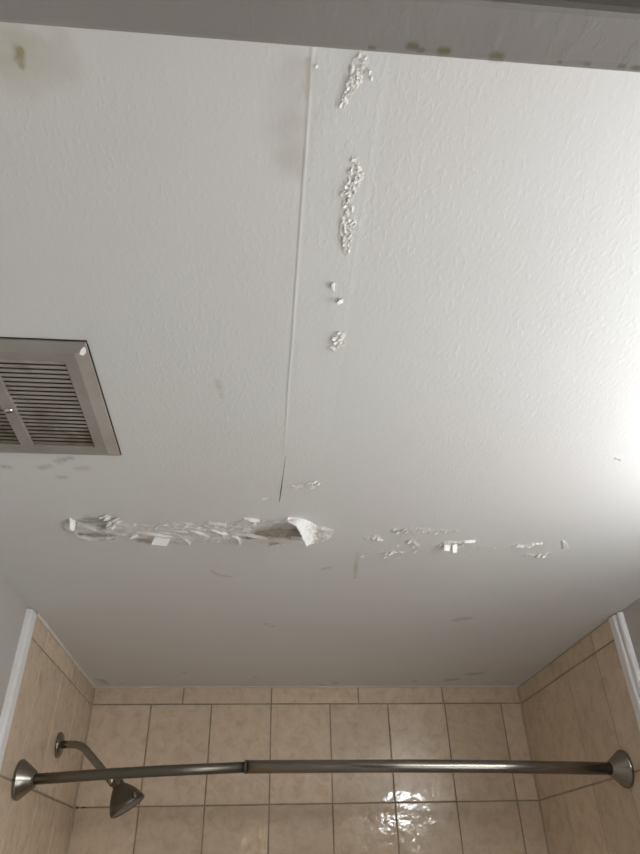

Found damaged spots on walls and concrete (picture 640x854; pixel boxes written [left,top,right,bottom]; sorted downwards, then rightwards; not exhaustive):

peeling [64,514,334,549]
peeling [356,526,570,559]